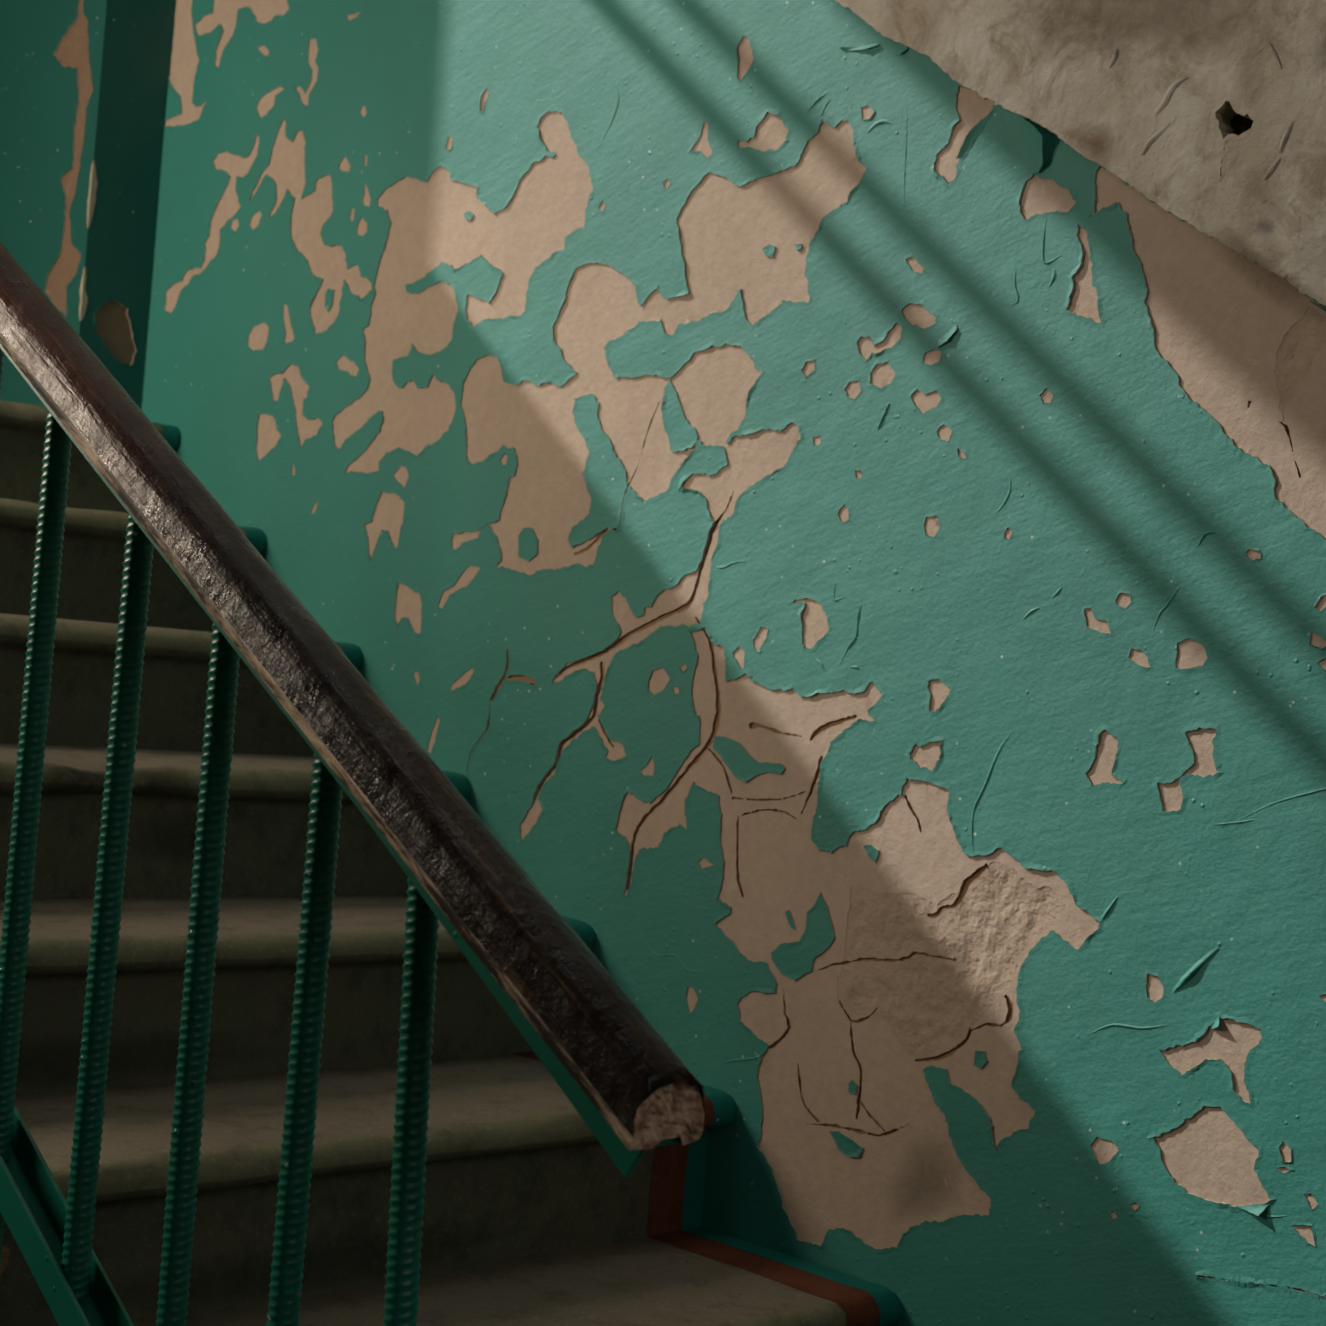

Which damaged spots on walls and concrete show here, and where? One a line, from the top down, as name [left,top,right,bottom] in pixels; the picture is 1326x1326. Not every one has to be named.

peeling [164,0,291,131]
peeling [43,0,140,368]
peeling [930,83,1326,549]
crack [574,401,660,555]
peeling [1243,547,1263,563]
peeling [163,33,1104,1255]
crack [464,491,857,897]
peeling [1082,725,1127,790]
peeling [1151,721,1224,815]
peeling [1086,1133,1121,1169]
peeling [1146,1011,1295,1216]
crack [1194,1270,1326,1300]